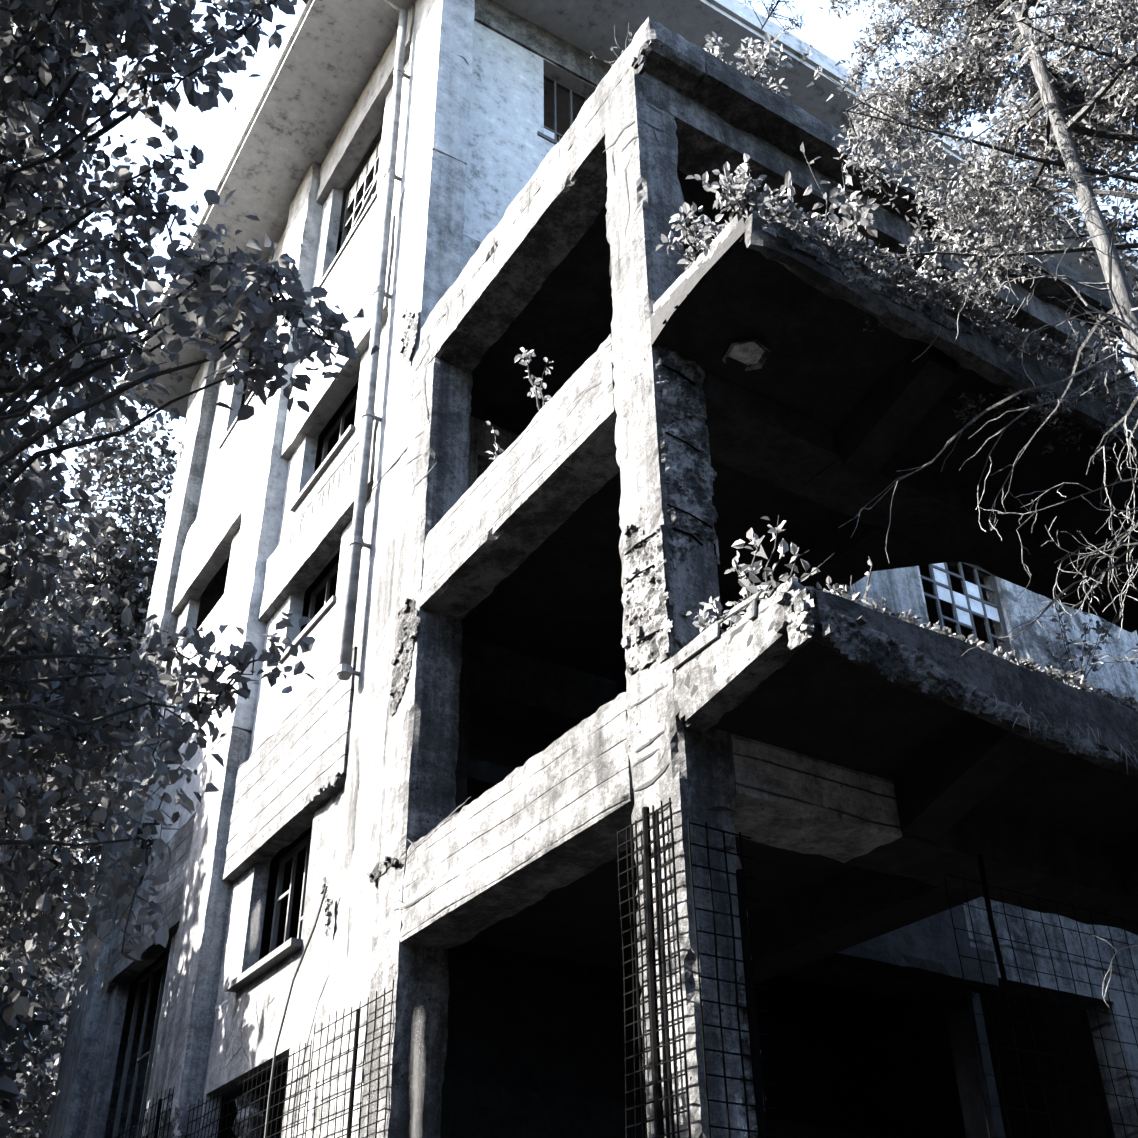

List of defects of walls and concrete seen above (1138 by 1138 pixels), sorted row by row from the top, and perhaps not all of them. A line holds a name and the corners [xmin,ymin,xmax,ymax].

spalling [389,598,420,716]
spalling [621,346,1120,761]